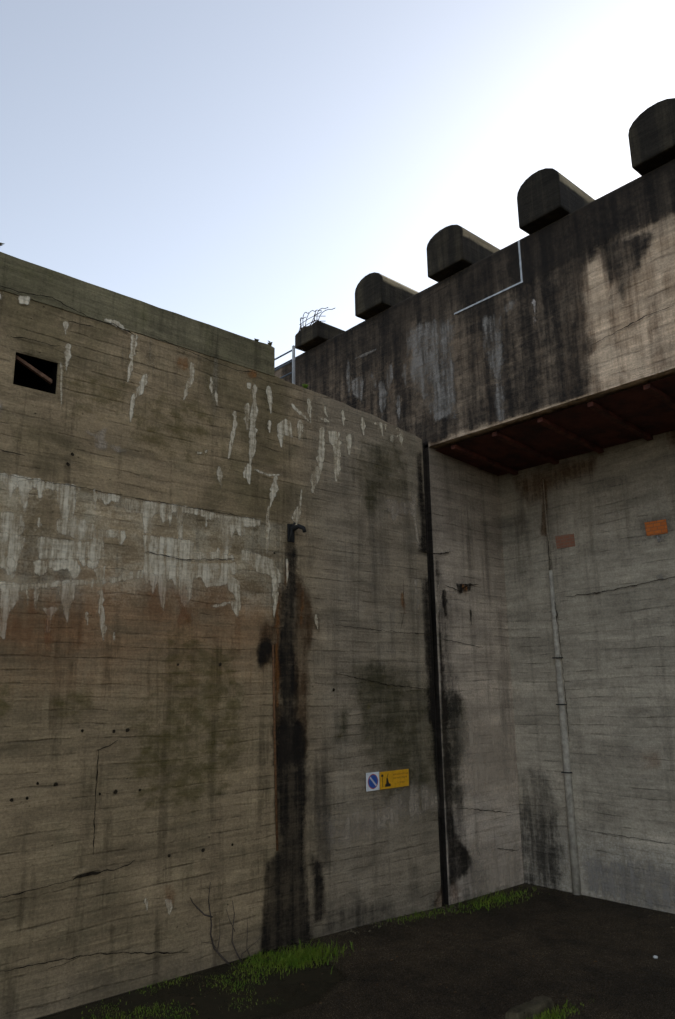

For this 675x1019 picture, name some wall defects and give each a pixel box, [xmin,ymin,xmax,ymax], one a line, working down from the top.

damp [0,160,675,953]
spalling [437,583,471,616]
crack [0,741,134,898]
crack [8,952,189,971]